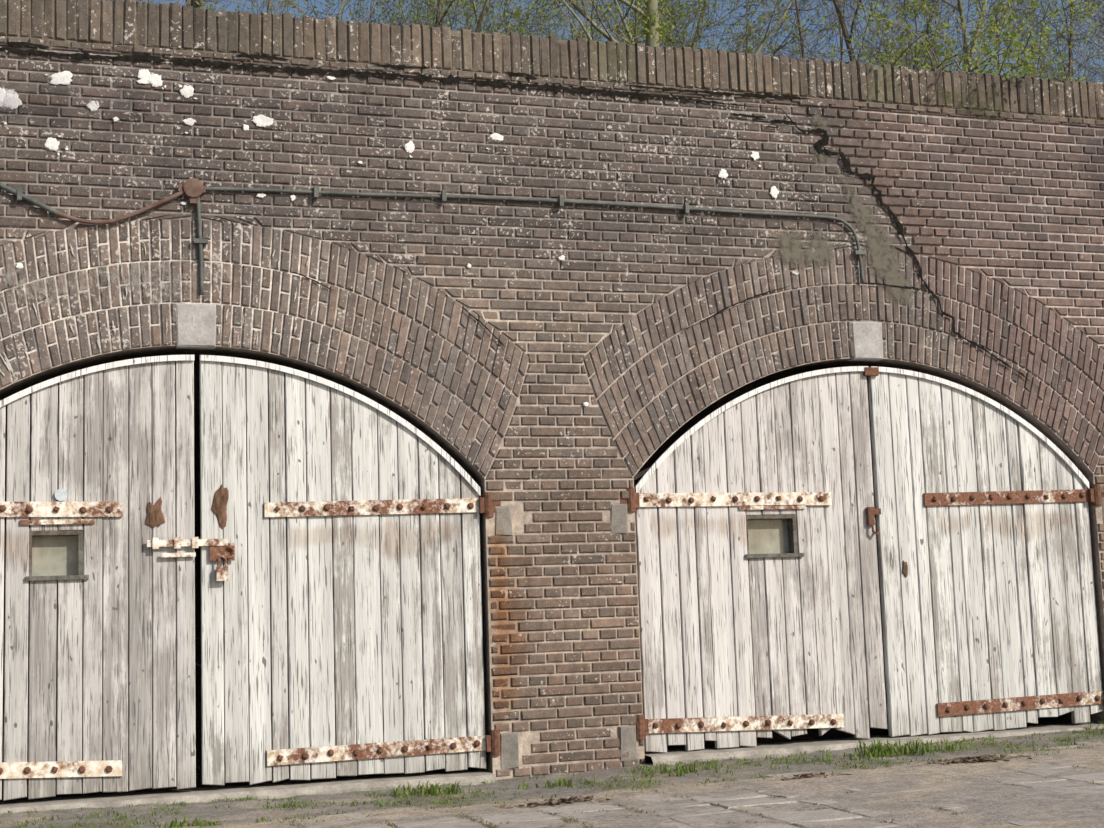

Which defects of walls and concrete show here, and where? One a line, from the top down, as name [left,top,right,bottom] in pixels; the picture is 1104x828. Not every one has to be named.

crack [0,42,1045,393]